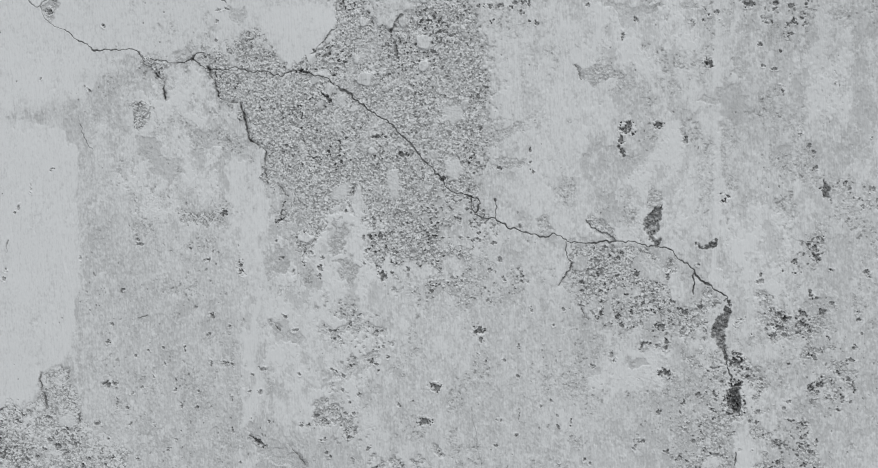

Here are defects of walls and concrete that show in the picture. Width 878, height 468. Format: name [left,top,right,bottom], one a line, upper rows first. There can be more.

spalling [201,0,539,317]
crack [28,0,730,307]
peeling [647,187,663,210]
spalling [782,221,836,277]
spalling [555,215,824,468]
spalling [751,273,859,412]
spalling [0,365,140,468]